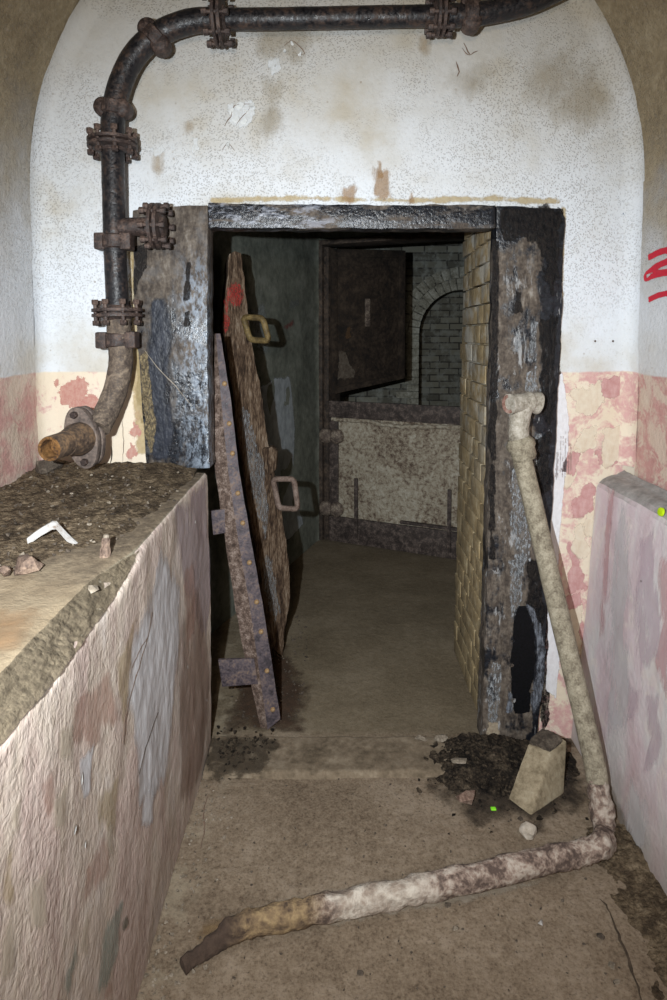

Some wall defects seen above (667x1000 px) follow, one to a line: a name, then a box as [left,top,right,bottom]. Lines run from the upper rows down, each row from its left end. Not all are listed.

peeling [224,98,255,129]
rust [343,186,355,202]
rust [374,163,389,198]
damp [375,196,565,218]
peeling [54,376,99,410]
peeling [126,422,141,458]
peeling [551,373,620,651]
peeling [546,613,560,698]